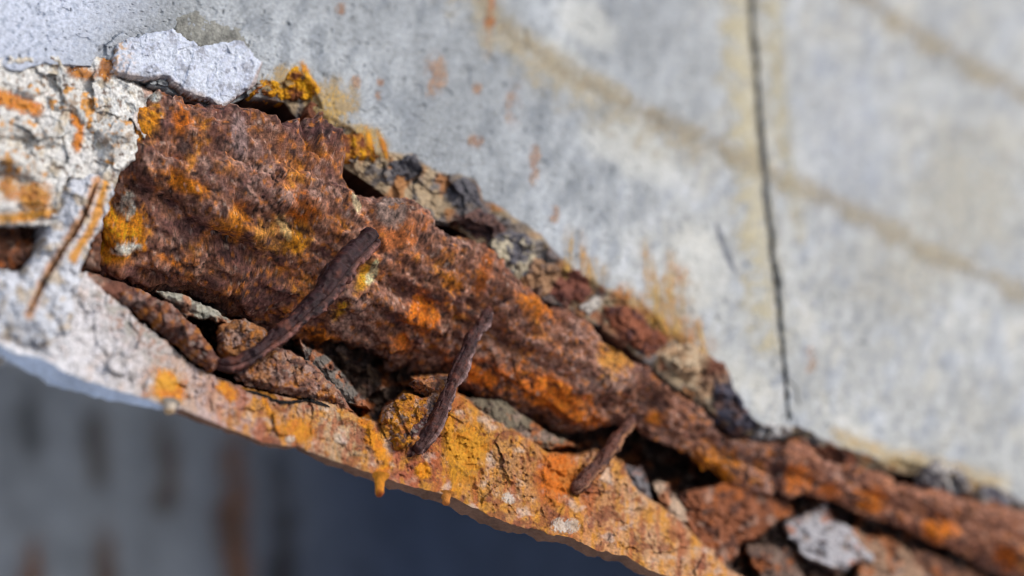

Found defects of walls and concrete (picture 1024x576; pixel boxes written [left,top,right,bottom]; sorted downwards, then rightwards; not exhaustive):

rust [0,91,41,116]
rust [0,175,56,223]
rust [71,113,84,151]
rust [67,58,113,80]
spalling [0,10,262,275]
rust [245,63,388,164]
spalling [377,153,423,185]
spalling [446,177,506,249]
crack [742,0,800,422]
spalling [0,218,1000,576]
rust [358,413,391,497]
rust [536,448,579,502]